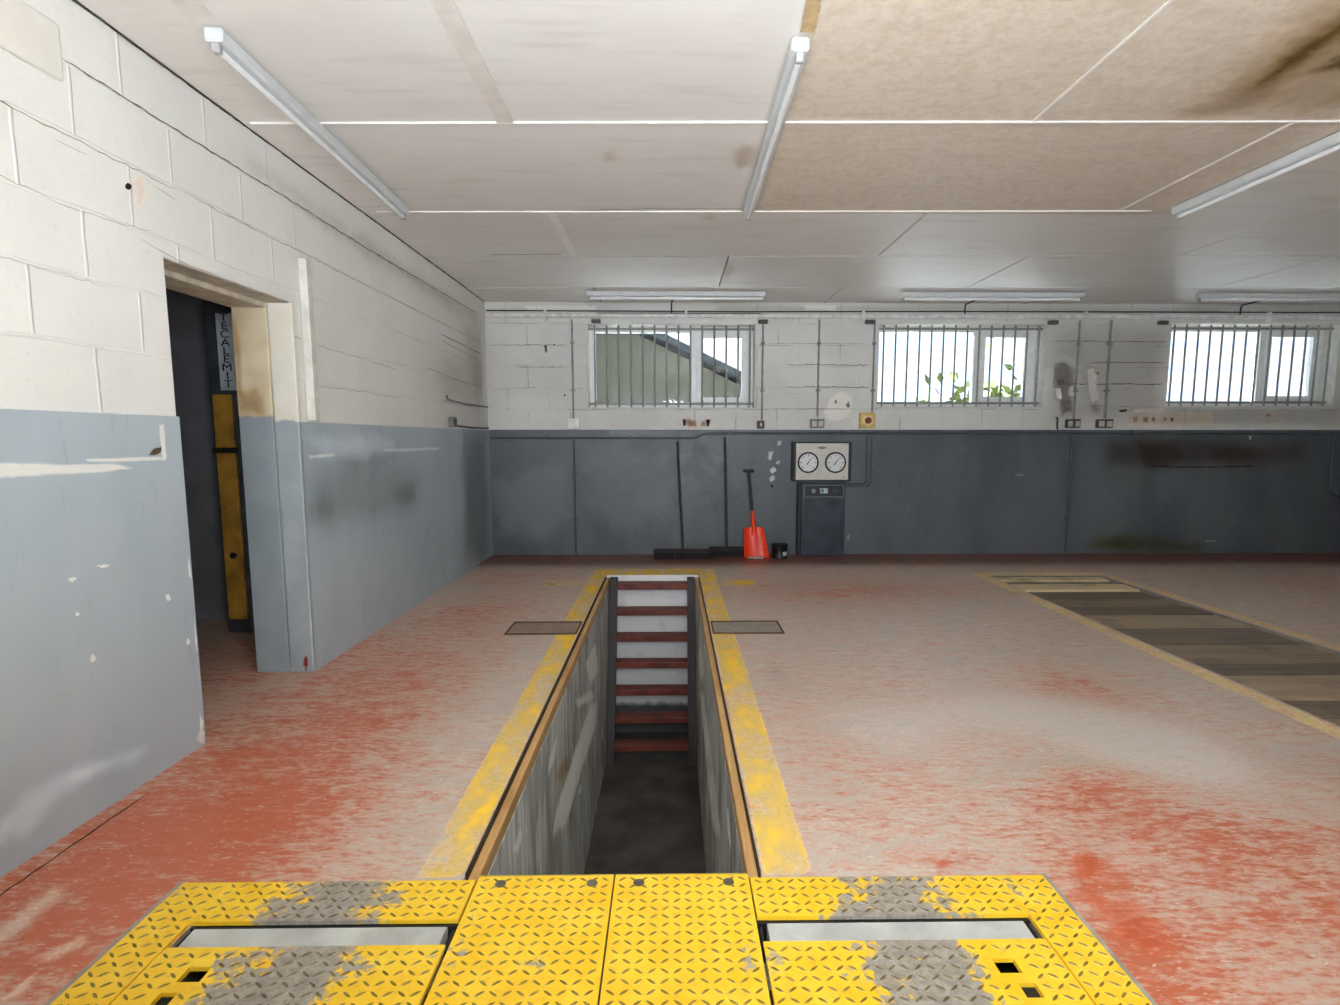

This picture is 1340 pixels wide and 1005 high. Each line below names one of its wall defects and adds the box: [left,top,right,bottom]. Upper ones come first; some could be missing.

damp [1163,0,1340,125]